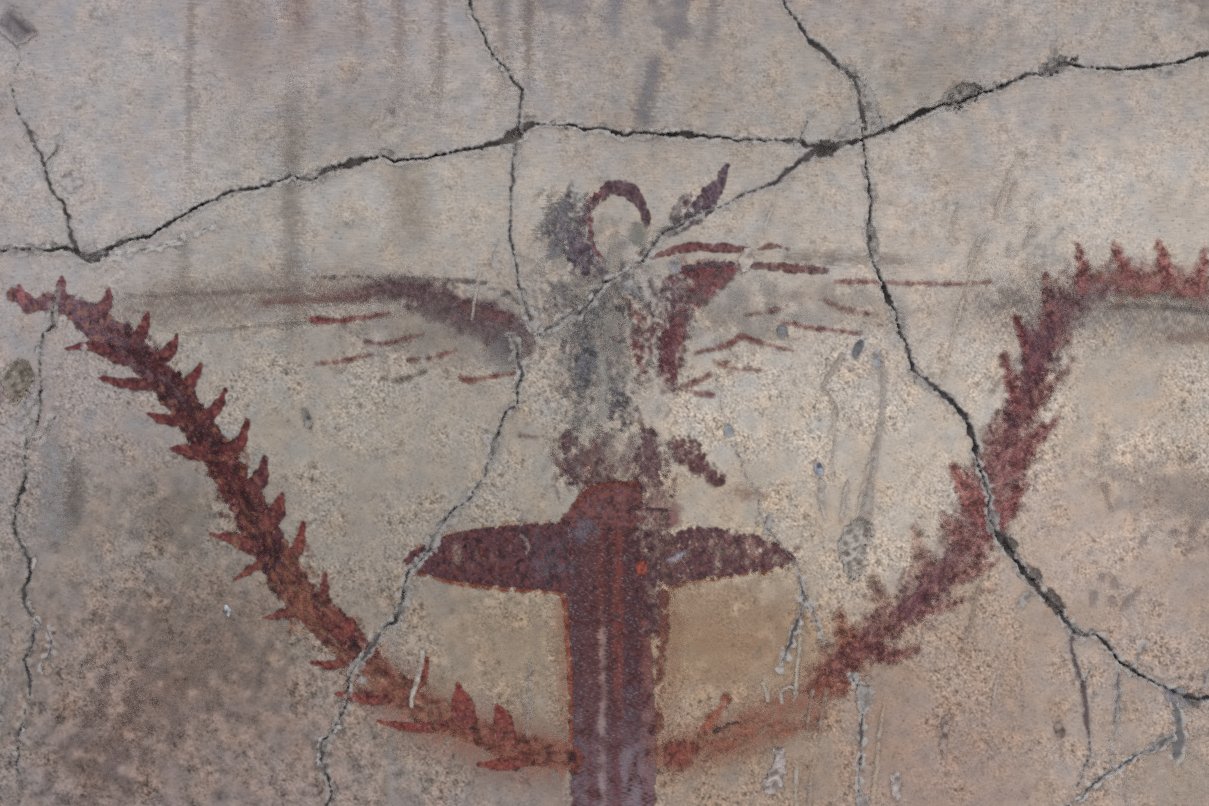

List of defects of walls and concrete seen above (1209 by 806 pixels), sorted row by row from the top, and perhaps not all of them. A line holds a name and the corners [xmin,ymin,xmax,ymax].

spalling [0,6,39,46]
crack [0,286,68,787]
crack [0,107,380,268]
crack [316,334,527,806]
crack [381,0,1209,806]
spalling [837,517,875,583]